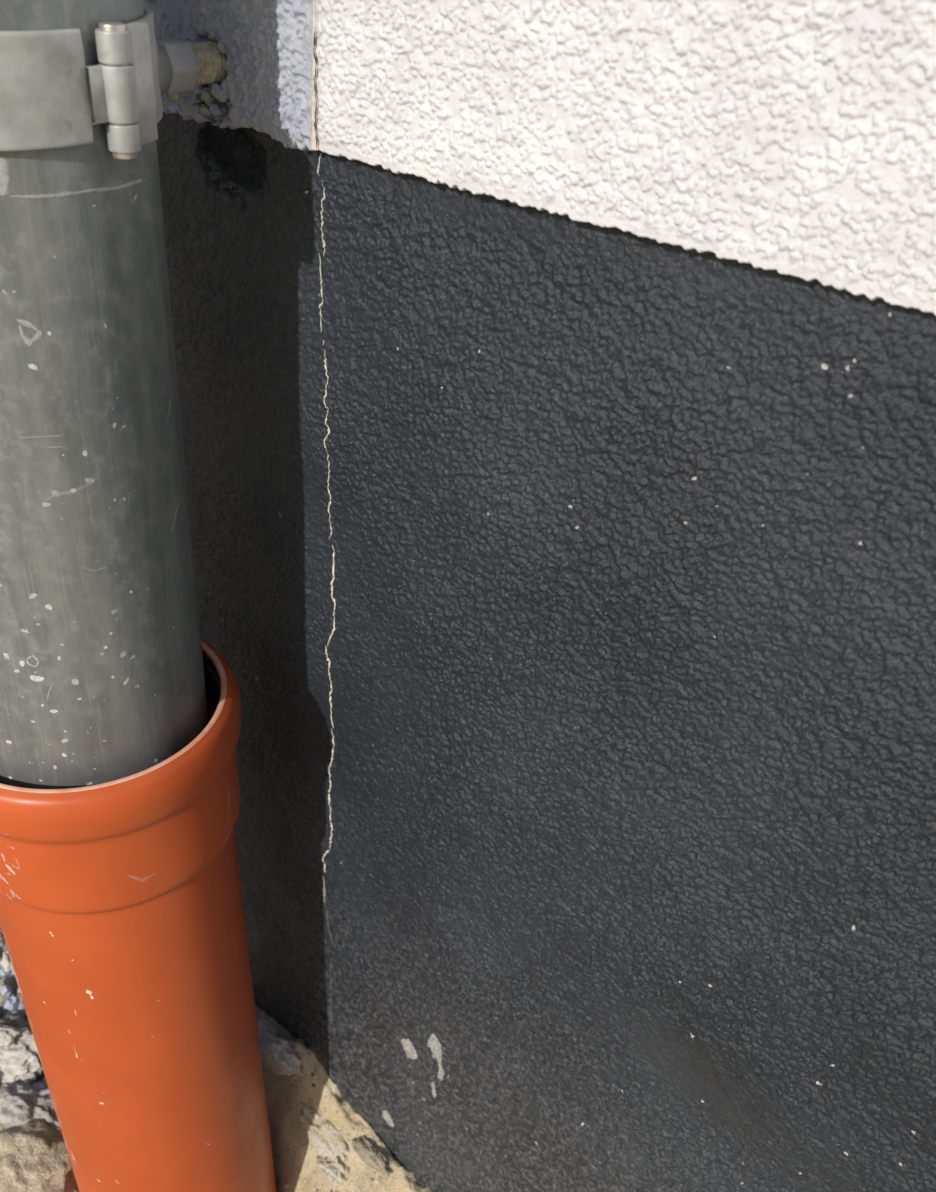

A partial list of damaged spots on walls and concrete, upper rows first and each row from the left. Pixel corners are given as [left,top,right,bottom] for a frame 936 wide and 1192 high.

spalling [193,79,267,202]
crack [313,2,336,872]